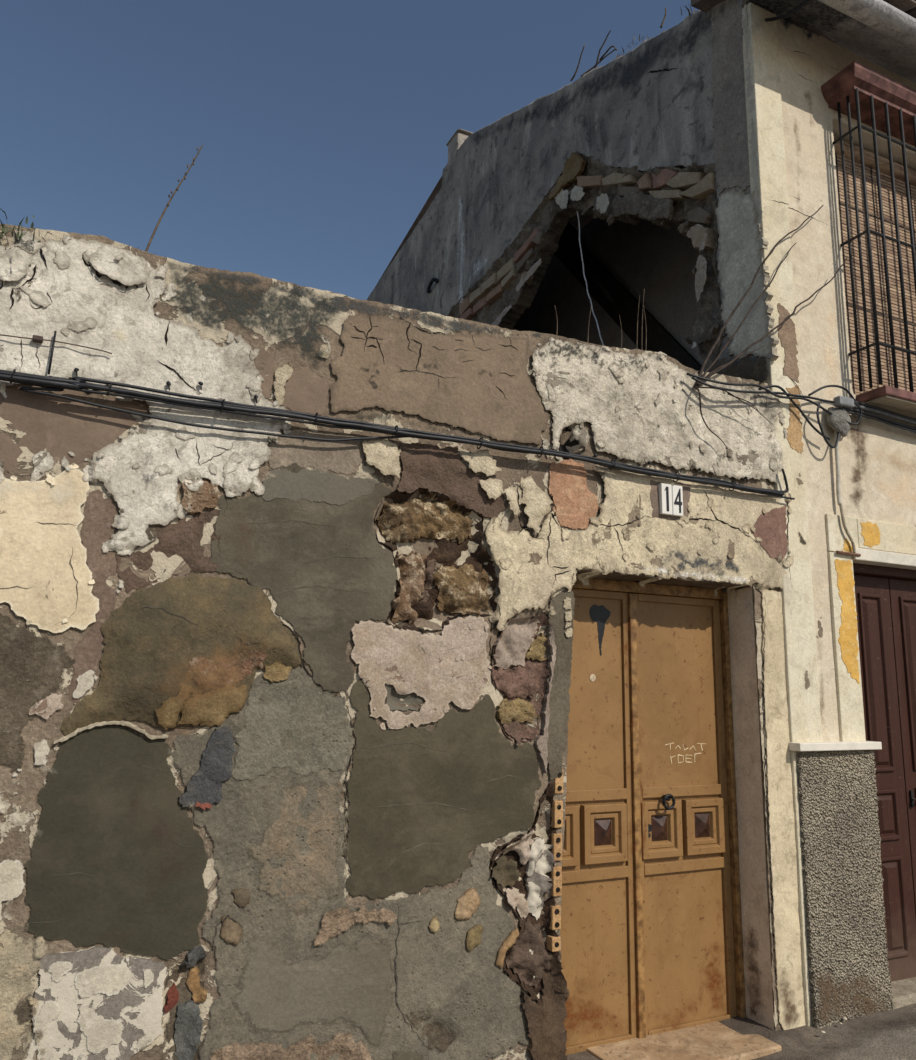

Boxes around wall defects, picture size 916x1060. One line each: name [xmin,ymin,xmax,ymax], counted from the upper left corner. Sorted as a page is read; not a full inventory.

damp [501,13,711,129]
crack [0,248,52,309]
crack [82,255,150,299]
damp [168,265,503,363]
crack [351,318,519,396]
flaking render [447,0,804,483]
crack [600,516,653,549]
flaking render [0,231,806,1060]
flaking render [835,521,881,684]